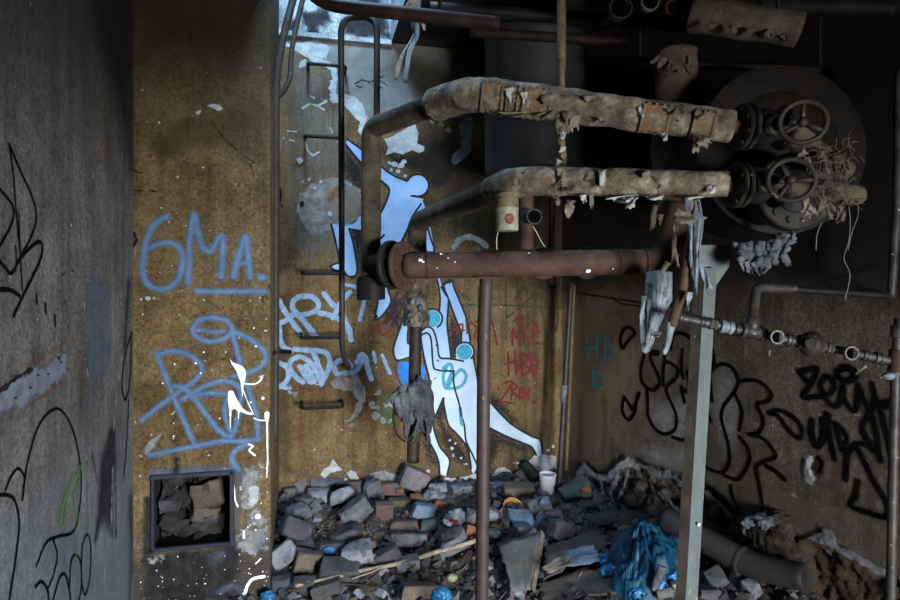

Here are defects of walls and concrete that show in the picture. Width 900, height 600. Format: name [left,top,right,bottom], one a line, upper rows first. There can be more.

peeling [285,37,471,135]
spalling [0,353,67,412]